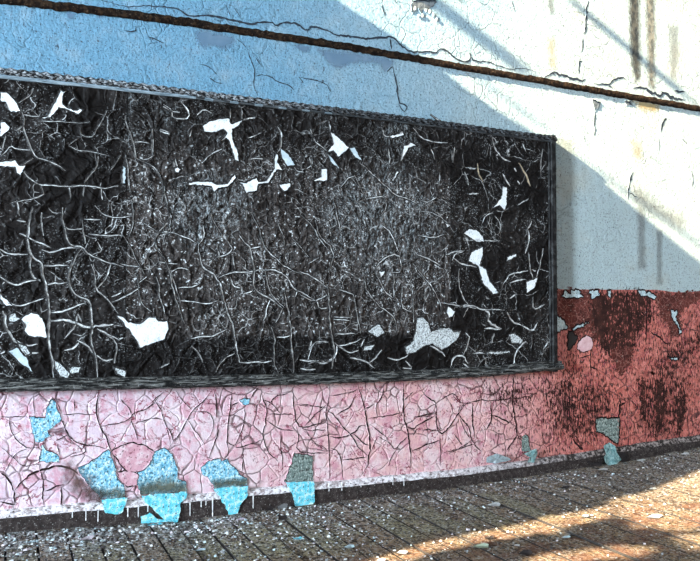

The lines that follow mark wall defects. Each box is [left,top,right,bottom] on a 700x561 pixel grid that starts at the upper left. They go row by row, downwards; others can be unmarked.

crack [101,0,685,101]
corrosion [629,0,655,87]
crack [387,66,408,113]
peeling [202,117,243,162]
crack [658,118,667,151]
crack [627,172,638,199]
peeling [462,228,500,295]
peeling [0,292,47,373]
peeling [116,314,169,349]
crack [0,88,549,506]
peeling [404,305,461,355]
peeling [480,286,700,450]